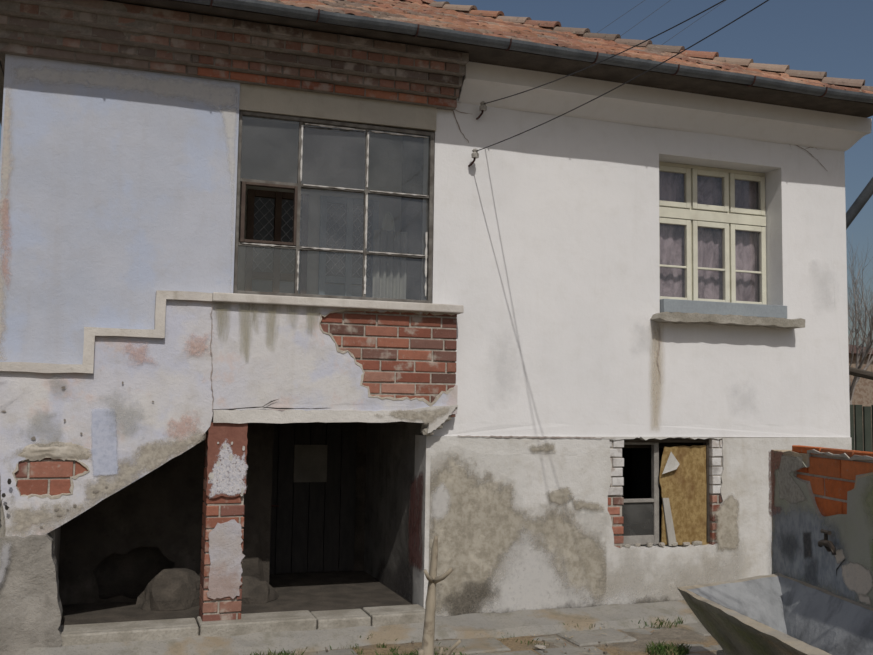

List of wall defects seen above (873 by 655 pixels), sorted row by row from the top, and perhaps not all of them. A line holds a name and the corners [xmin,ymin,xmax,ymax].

crack [210,307,325,410]
flaking render [319,308,457,424]
flaking render [0,408,204,583]
peeling [208,441,248,497]
flaking render [608,496,624,548]
flaking render [709,494,722,545]
flaking render [792,445,873,518]